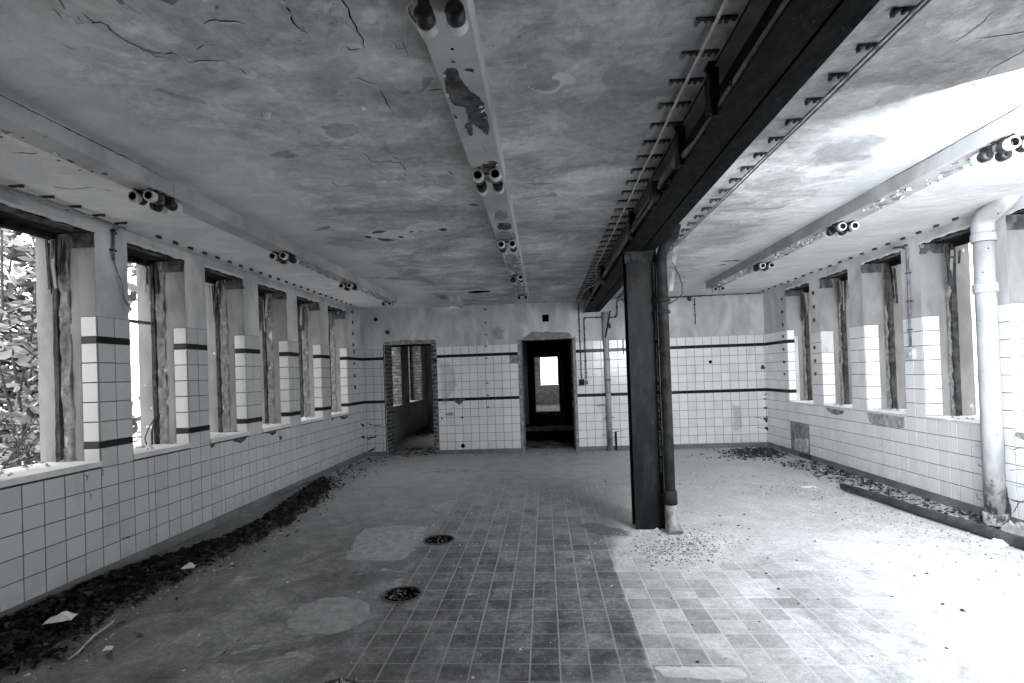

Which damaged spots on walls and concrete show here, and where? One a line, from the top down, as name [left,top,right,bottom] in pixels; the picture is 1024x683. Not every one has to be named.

crack [53,0,245,74]
crack [279,0,308,34]
crack [337,0,365,52]
peeling [442,48,490,136]
spalling [791,423,809,454]